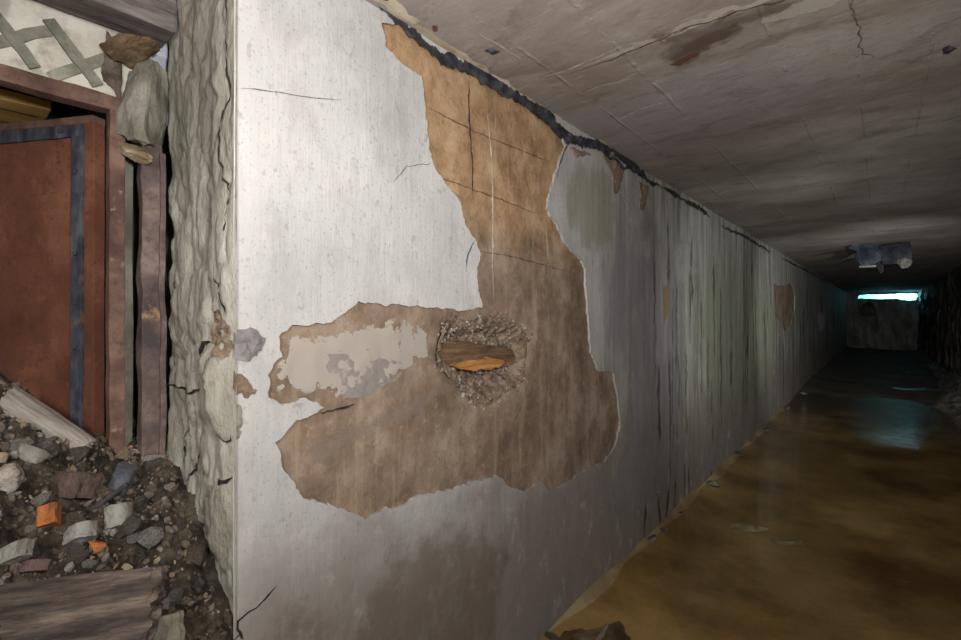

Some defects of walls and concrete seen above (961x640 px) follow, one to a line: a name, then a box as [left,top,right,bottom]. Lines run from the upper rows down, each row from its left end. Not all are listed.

water stain [762,0,841,23]
crack [850,0,874,58]
crack [217,0,339,231]
crack [379,0,828,284]
peeling [212,24,624,518]
peeling [774,283,794,331]
crack [222,585,277,640]